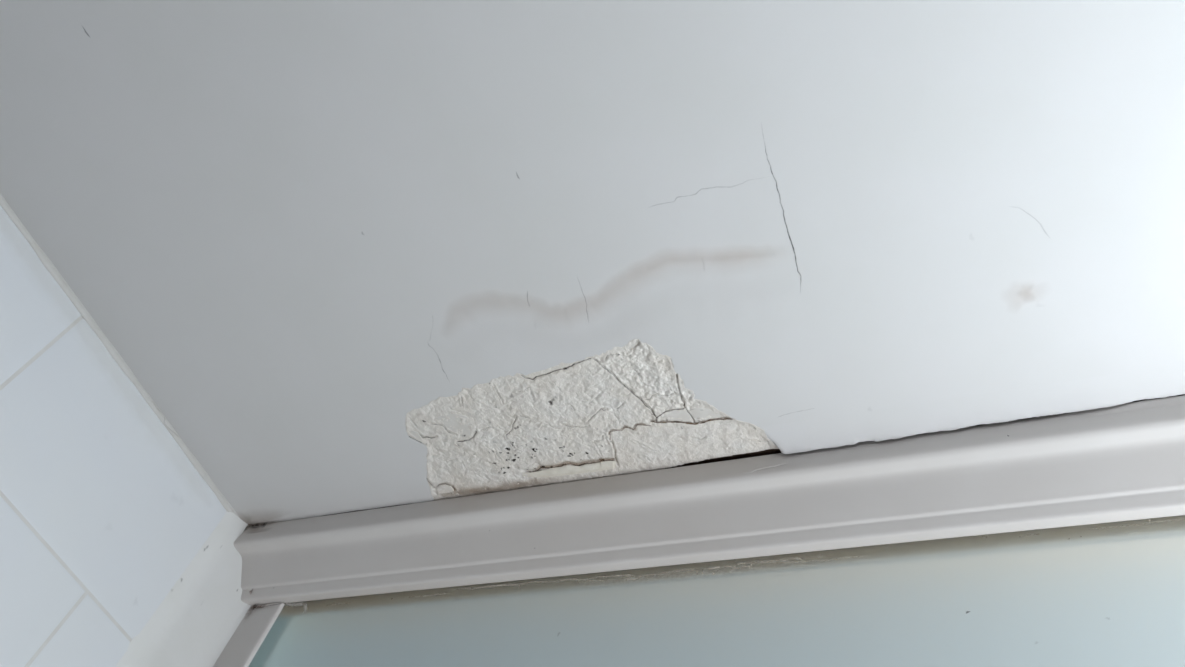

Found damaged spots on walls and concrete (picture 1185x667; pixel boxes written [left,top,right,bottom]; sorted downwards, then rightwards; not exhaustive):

peeling [405,339,1185,501]